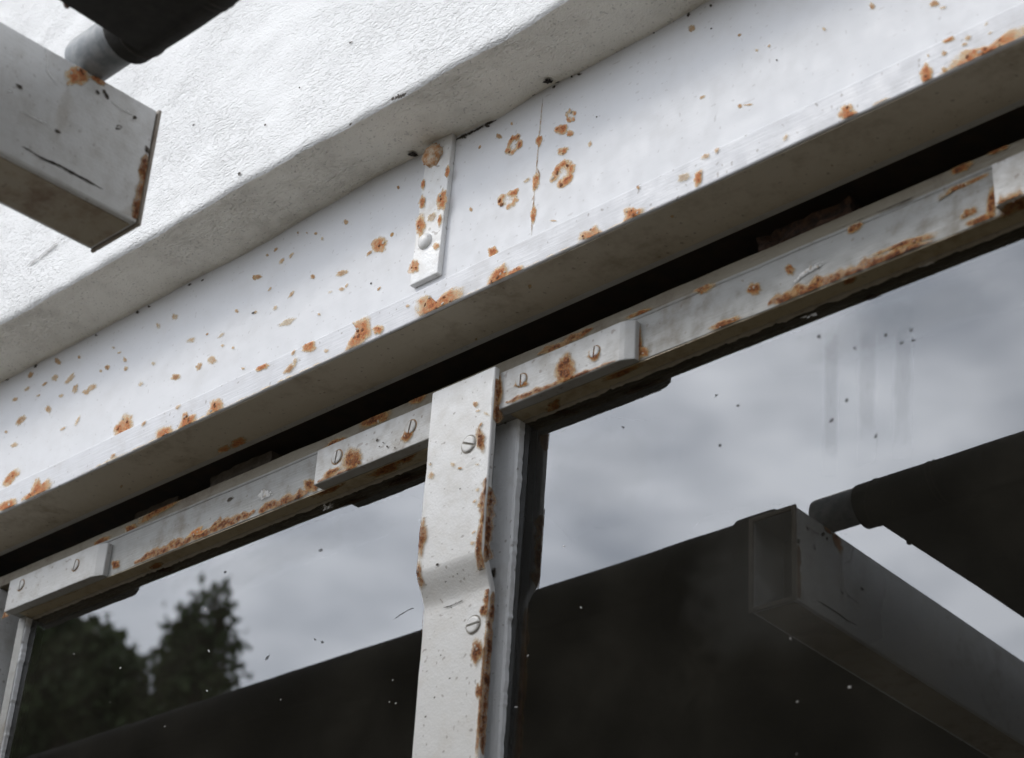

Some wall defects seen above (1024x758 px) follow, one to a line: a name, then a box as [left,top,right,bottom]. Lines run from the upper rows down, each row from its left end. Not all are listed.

rust [919,27,1024,82]
rust [132,154,148,219]
rust [416,180,447,236]
rust [533,108,576,190]
rust [406,204,661,316]
rust [747,234,933,305]
rust [342,318,383,353]
rust [476,327,648,450]
rust [134,437,361,569]
rust [416,520,427,587]
rust [472,477,496,571]
rust [471,589,495,755]